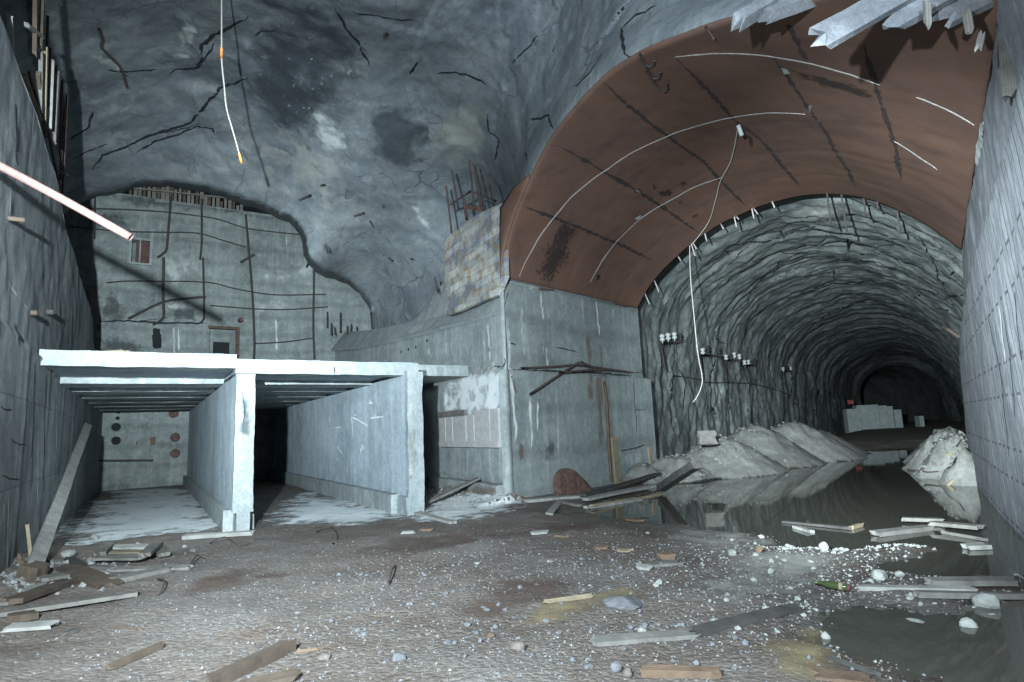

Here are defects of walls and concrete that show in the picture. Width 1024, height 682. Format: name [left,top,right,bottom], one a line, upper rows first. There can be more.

crack [109,16,275,77]
crack [335,10,418,66]
crack [70,77,248,169]
water stain [373,110,425,163]
crack [531,114,554,129]